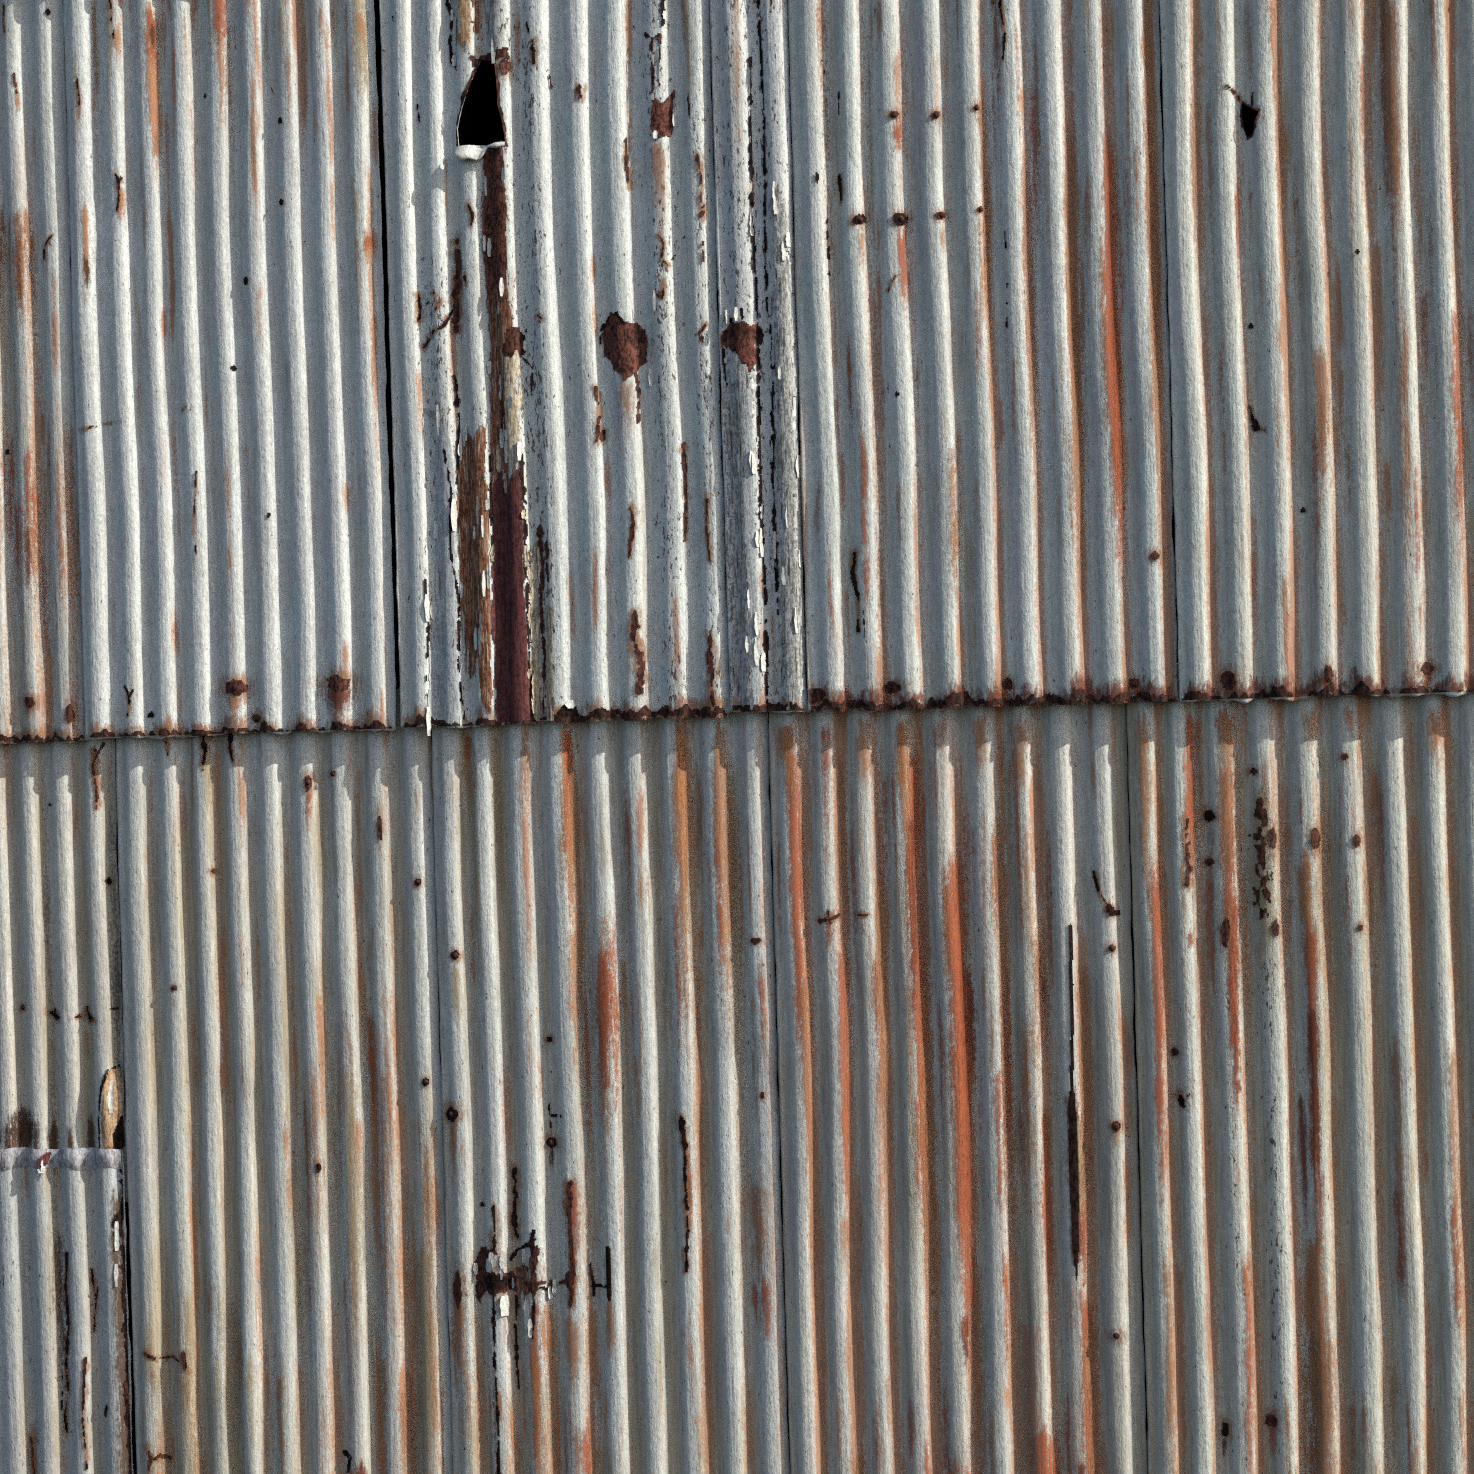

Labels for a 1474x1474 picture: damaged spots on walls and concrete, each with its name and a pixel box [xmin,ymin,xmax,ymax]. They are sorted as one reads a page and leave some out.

corrosion [887,109,901,149]
corrosion [0,208,36,314]
corrosion [848,211,870,255]
corrosion [892,210,912,301]
corrosion [935,210,948,245]
corrosion [972,0,1164,582]
peeling [424,0,555,736]
corrosion [835,344,861,462]
corrosion [0,429,80,628]
corrosion [936,424,977,596]
peeling [37,1149,67,1173]